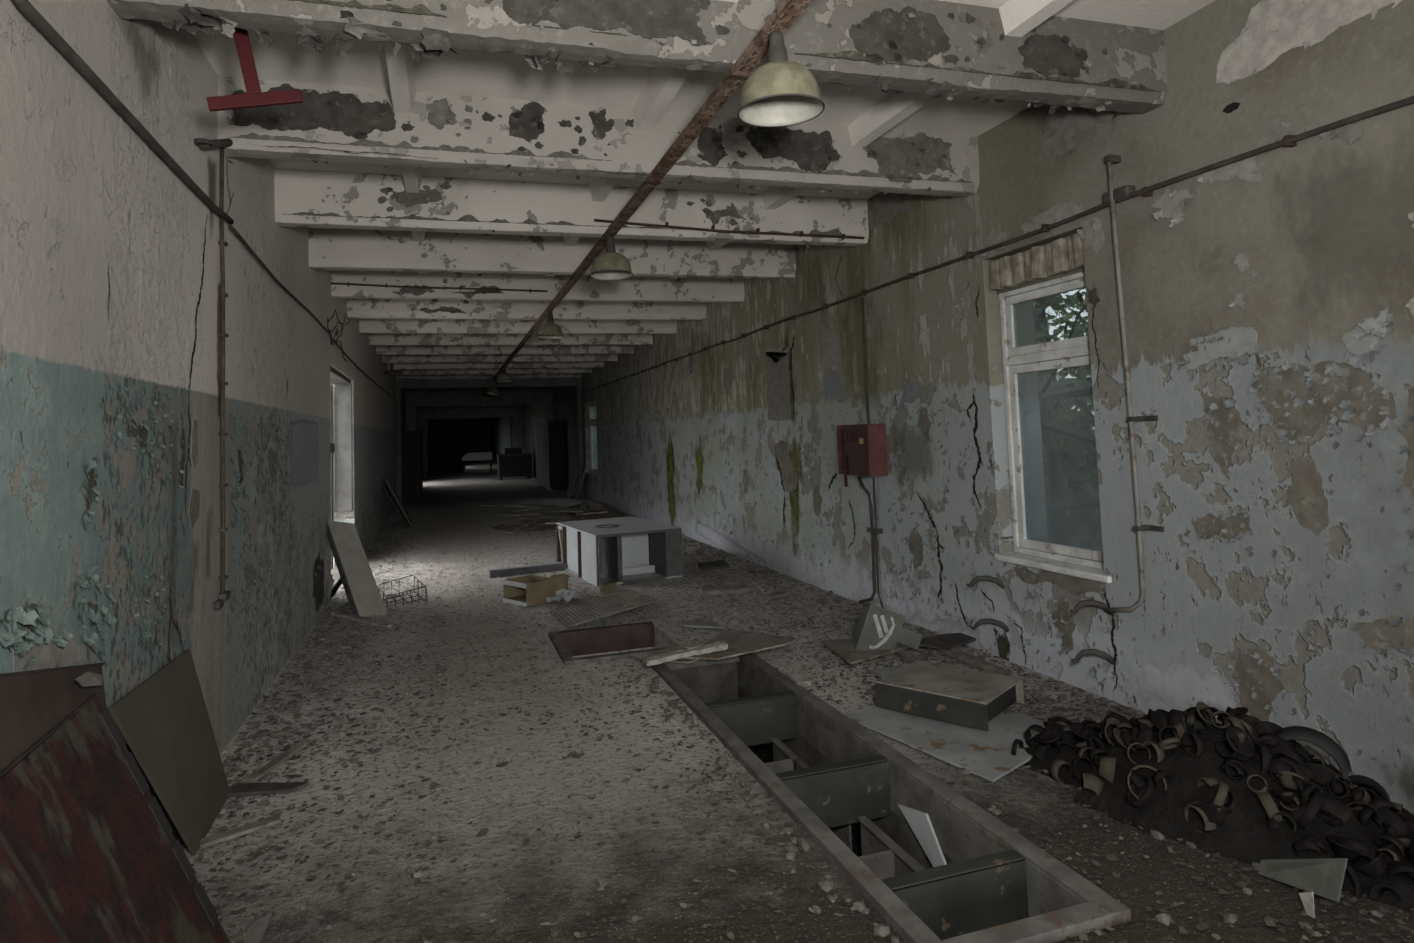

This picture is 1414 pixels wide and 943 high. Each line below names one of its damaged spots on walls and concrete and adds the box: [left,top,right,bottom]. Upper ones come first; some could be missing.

peeling [794,6,1161,157]
peeling [1216,0,1403,84]
crack [966,391,983,509]
peeling [81,457,100,531]
peeling [229,410,289,615]
damp [790,487,799,555]
flaking render [312,554,328,613]
crack [917,495,1027,666]
peeling [1231,648,1297,721]